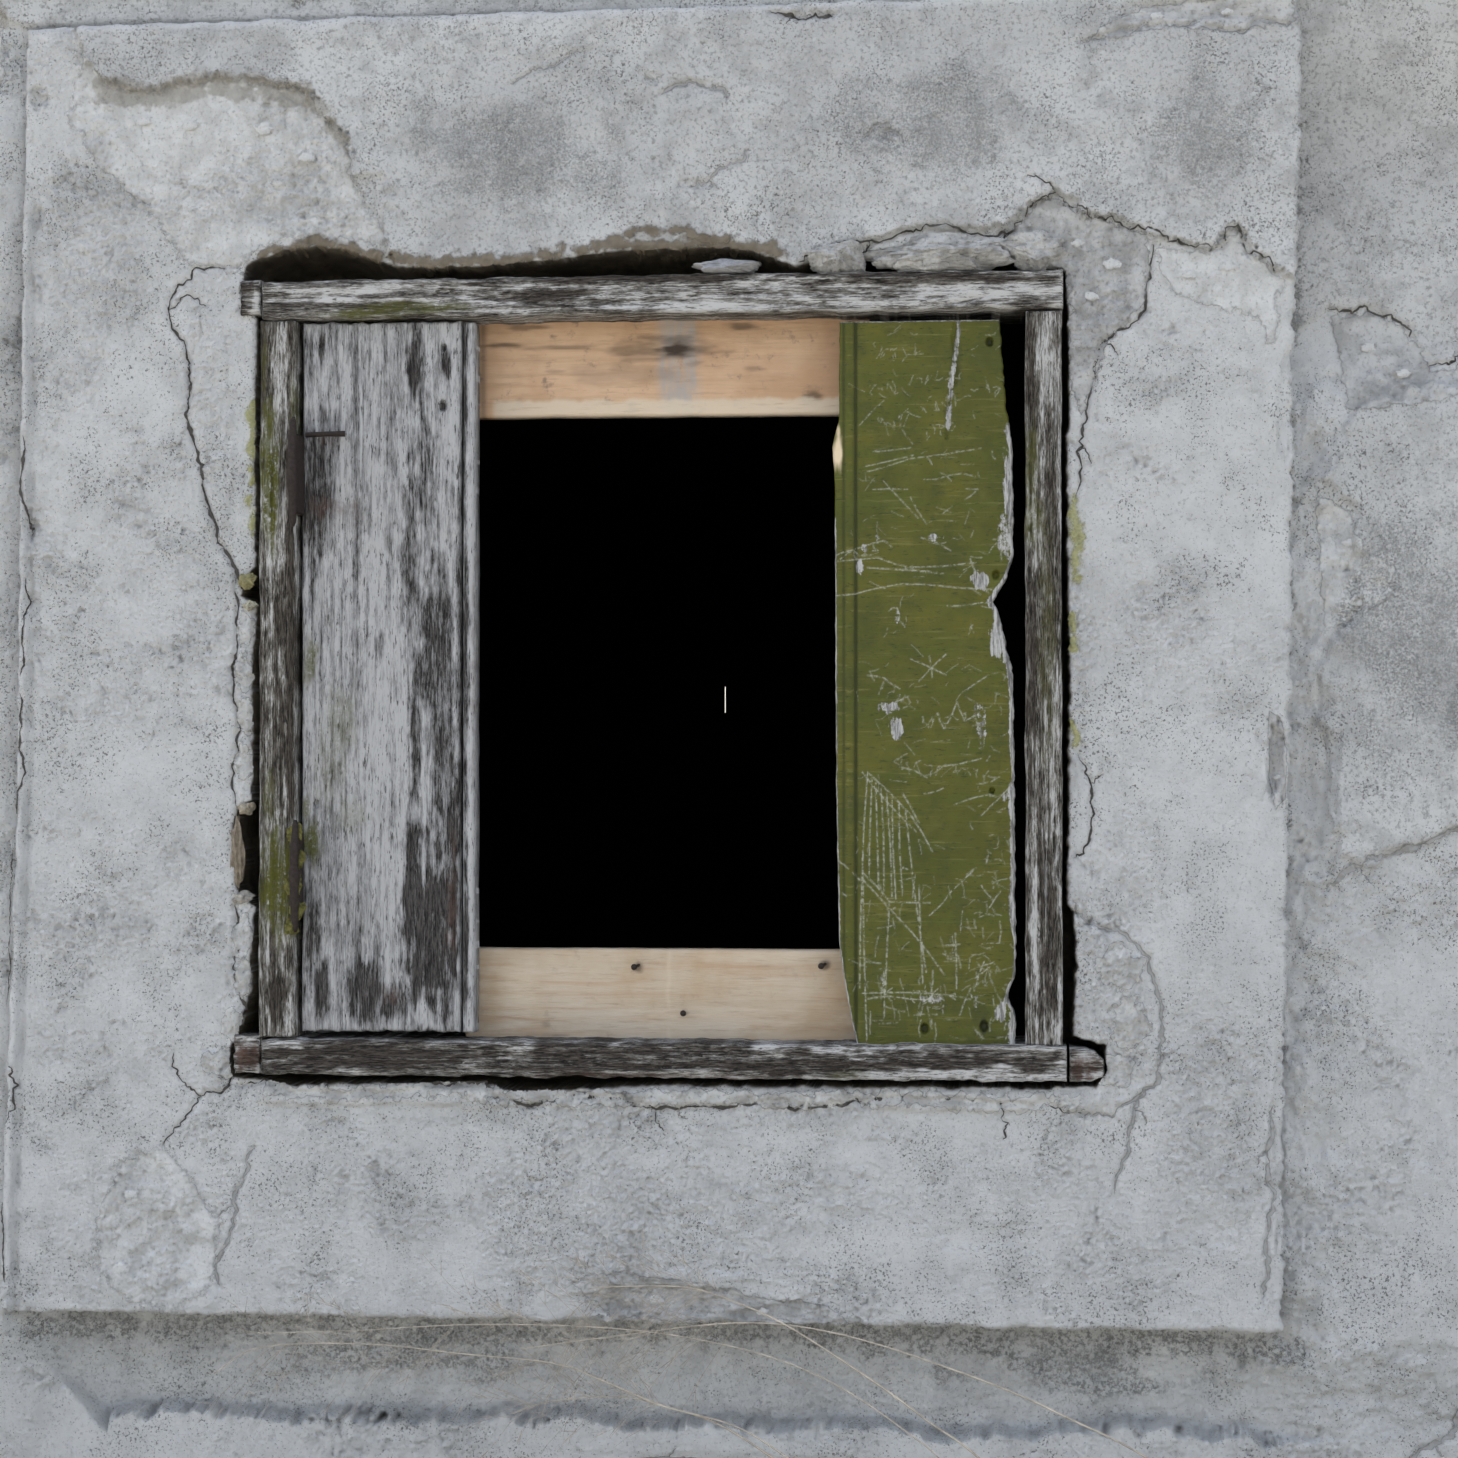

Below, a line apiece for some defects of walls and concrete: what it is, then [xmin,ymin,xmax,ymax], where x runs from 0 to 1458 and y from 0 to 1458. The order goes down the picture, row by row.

crack [799,175,1275,494]
crack [1328,305,1458,366]
crack [168,265,260,805]
crack [1325,827,1458,889]